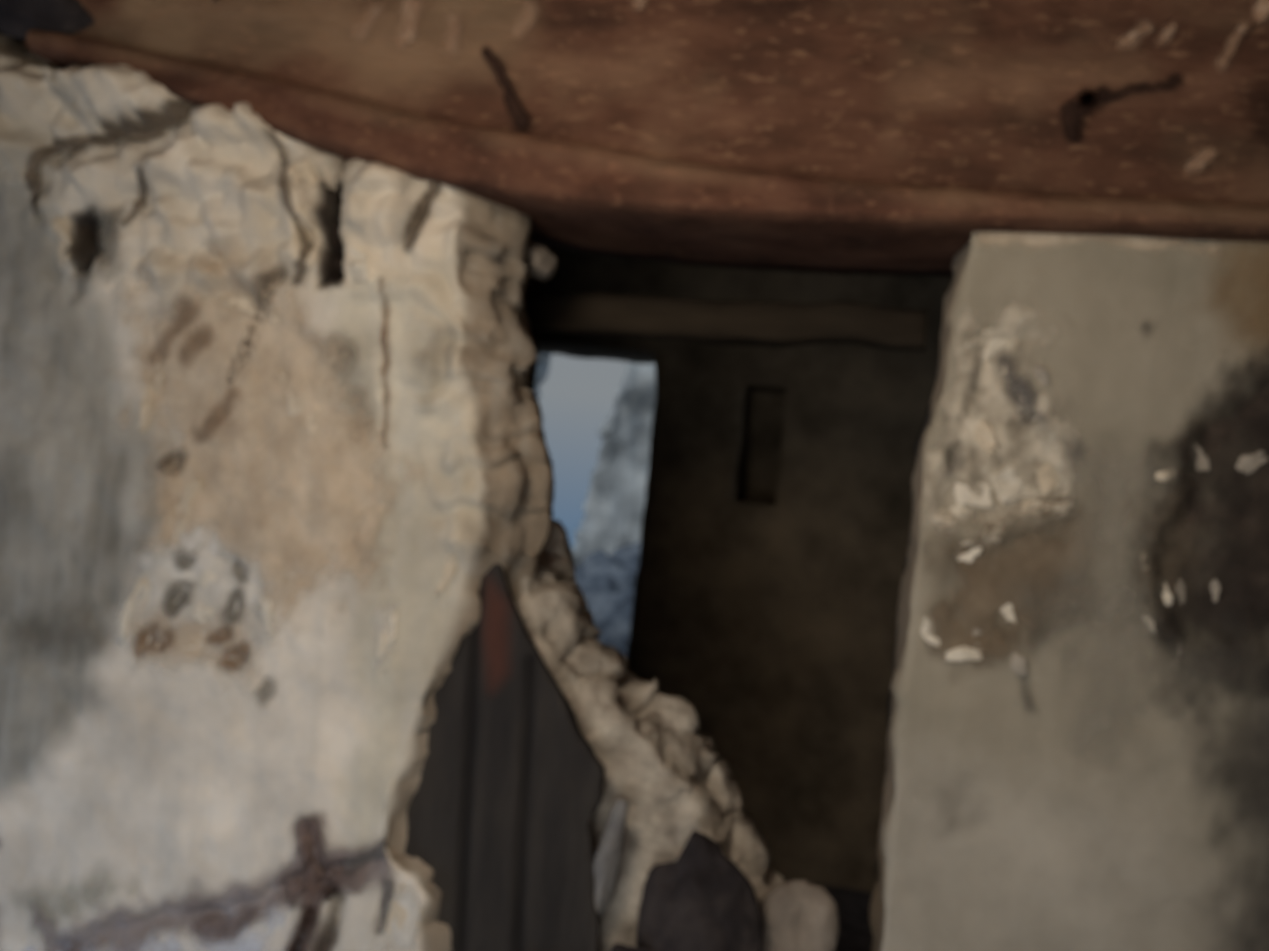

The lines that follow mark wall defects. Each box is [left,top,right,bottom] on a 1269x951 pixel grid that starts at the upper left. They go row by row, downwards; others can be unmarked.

spalling [51,209,117,288]
crack [24,100,197,225]
crack [228,132,313,383]
spalling [287,158,371,286]
peeling [117,255,392,670]
spalling [921,304,1099,677]
crack [36,818,393,951]